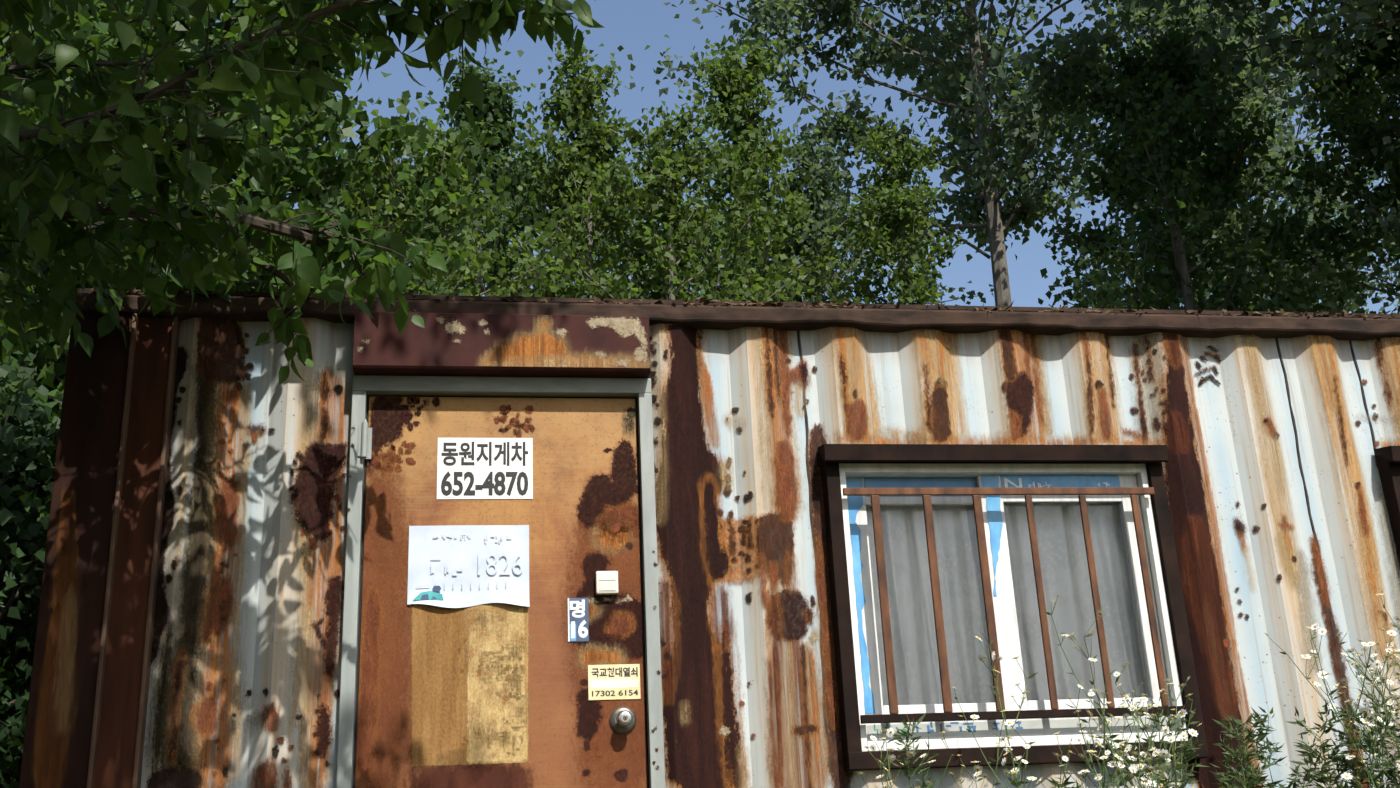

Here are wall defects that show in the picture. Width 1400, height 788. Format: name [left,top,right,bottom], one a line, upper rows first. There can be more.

rust [192,369,532,788]
peeling [585,316,648,367]
rust [481,320,1370,788]
rust [1310,335,1400,659]